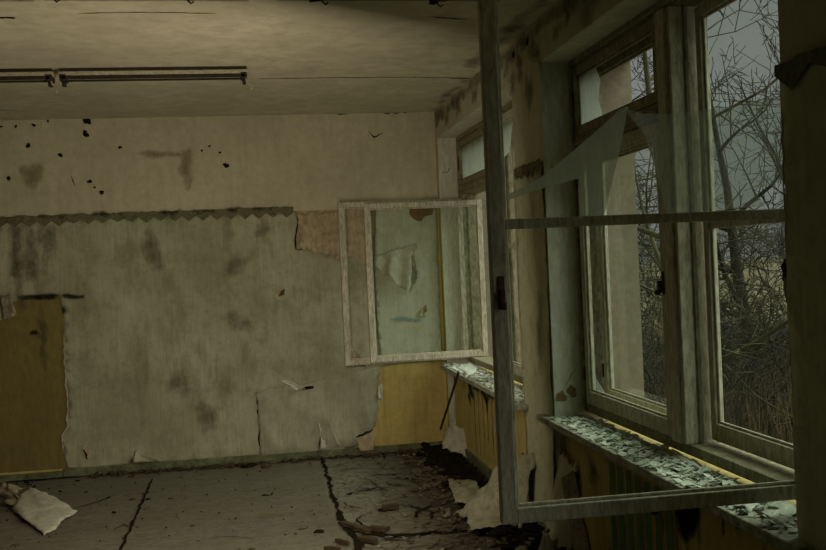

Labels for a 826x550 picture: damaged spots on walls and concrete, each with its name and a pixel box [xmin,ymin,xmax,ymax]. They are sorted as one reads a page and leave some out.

peeling [294,209,418,293]
peeling [409,208,433,221]
peeling [0,294,69,473]
crack [5,473,109,483]
crack [321,452,493,550]
leakage [611,508,700,550]